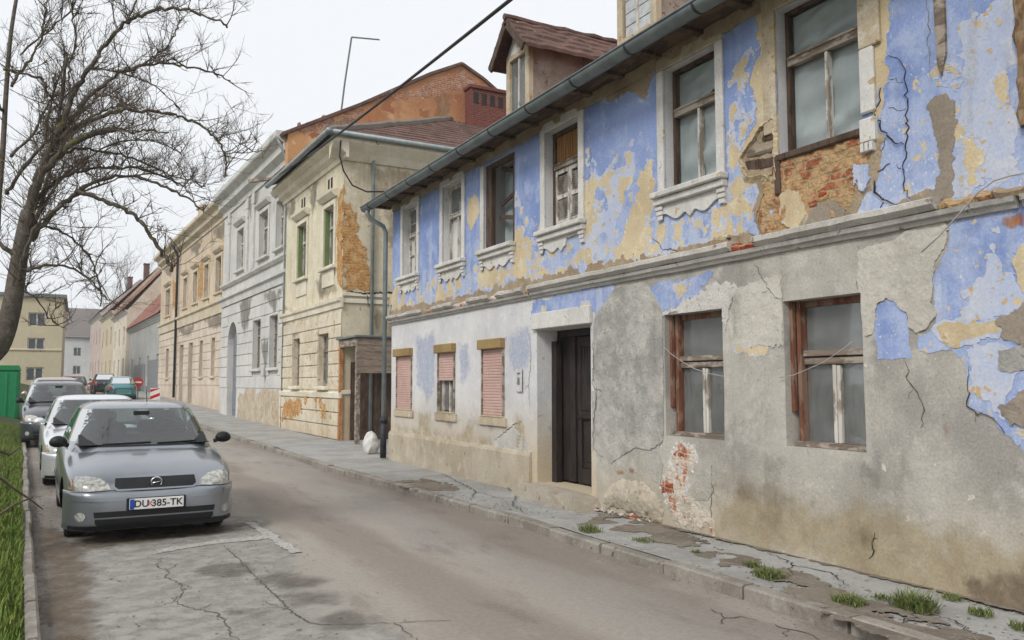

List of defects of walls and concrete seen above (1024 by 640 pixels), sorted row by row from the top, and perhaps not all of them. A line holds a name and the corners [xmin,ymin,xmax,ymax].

spalling [388,0,935,315]
crack [871,0,931,207]
peeling [927,60,964,93]
peeling [954,118,991,193]
peeling [989,71,1010,112]
spalling [336,184,370,292]
peeling [917,204,1024,451]
spalling [659,440,717,538]